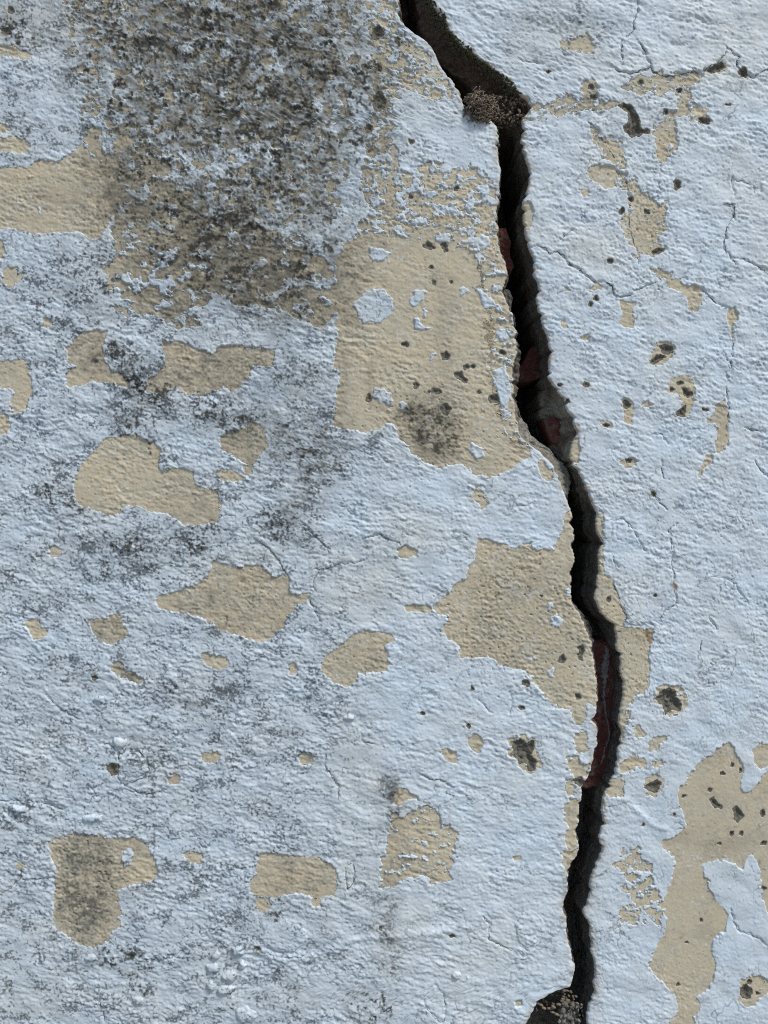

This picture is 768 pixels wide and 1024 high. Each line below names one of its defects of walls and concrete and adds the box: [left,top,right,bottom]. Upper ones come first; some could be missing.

water stain [0,4,35,45]
water stain [63,0,378,331]
peeling [0,0,553,510]
peeling [523,62,747,314]
peeling [73,422,268,526]
peeling [156,561,311,642]
water stain [286,443,323,481]
peeling [404,511,598,874]
crack [398,0,656,1024]
peeling [49,832,159,949]
peeling [379,788,458,888]
peeling [612,742,768,1024]